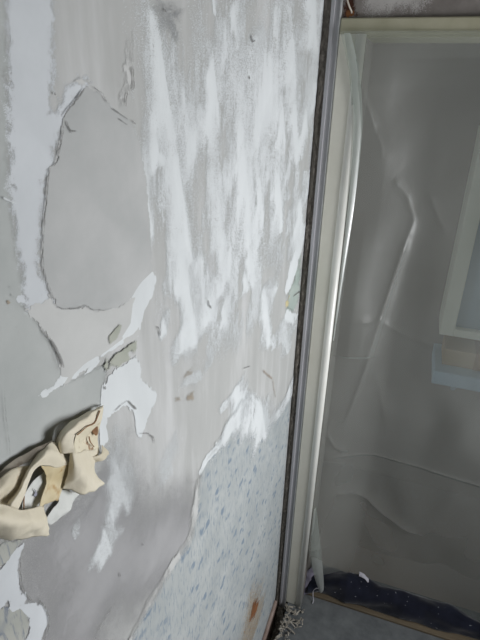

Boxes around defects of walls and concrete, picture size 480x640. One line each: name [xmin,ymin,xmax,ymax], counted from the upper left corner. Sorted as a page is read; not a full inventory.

crack [44,70,136,224]
peeling [0,0,200,640]
corrosion [238,573,267,640]